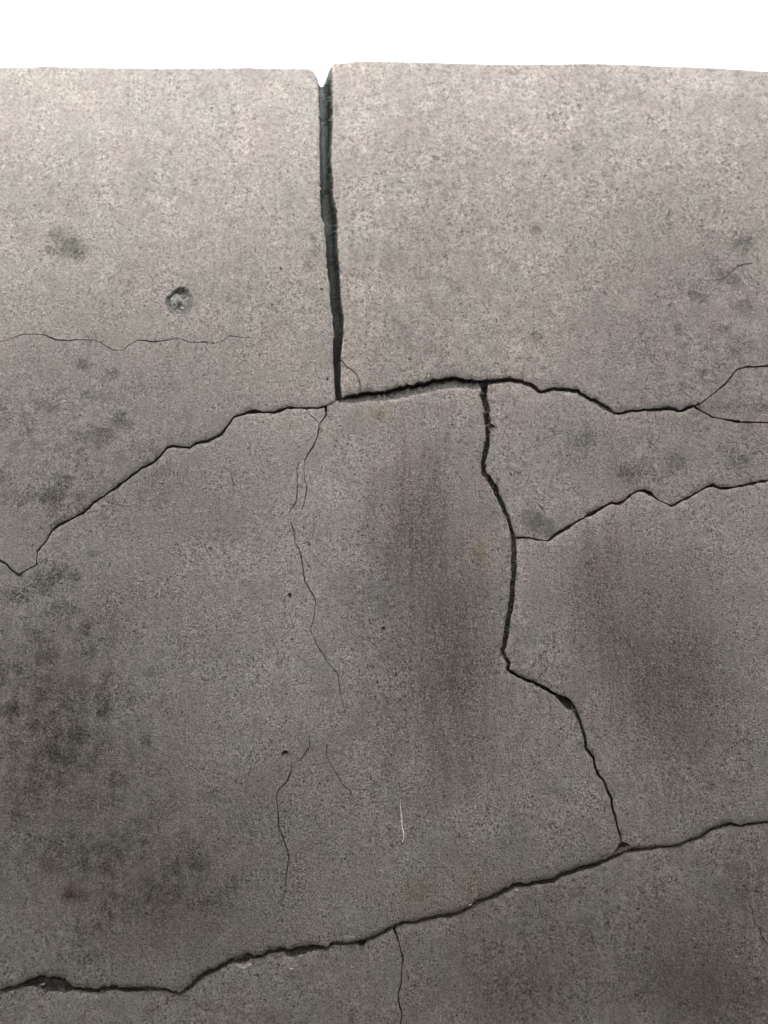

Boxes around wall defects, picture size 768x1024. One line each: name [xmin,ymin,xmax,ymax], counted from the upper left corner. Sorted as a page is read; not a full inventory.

crack [0,66,768,842]
crack [276,736,356,904]
crack [0,821,768,1024]